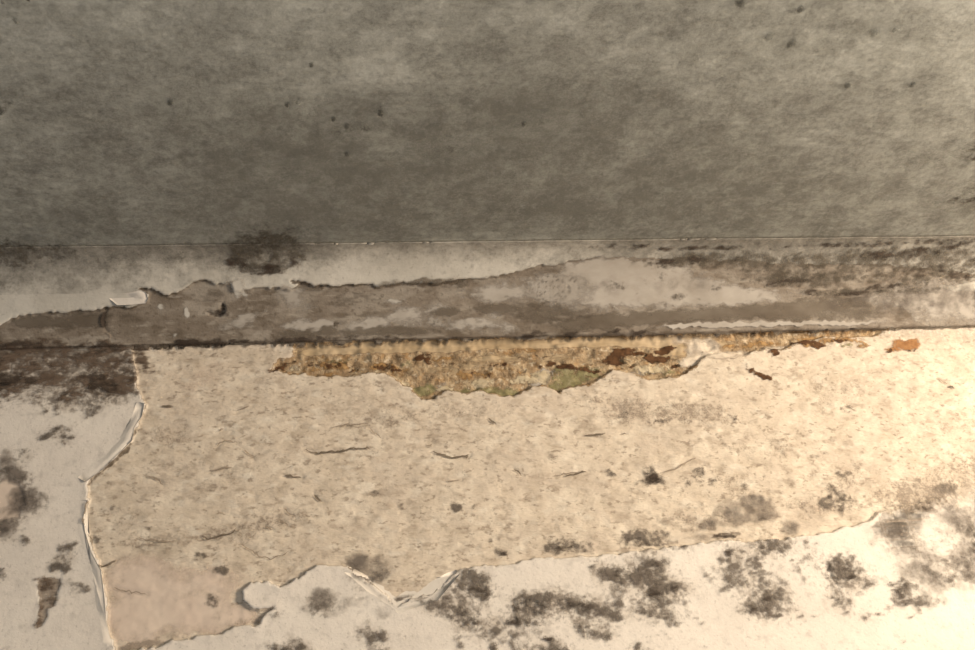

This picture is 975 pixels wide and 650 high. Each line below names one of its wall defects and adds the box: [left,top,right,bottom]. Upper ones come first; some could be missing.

water stain [79,76,975,296]
water stain [0,338,154,418]
water stain [40,425,75,444]
peeling [0,256,975,650]
water stain [0,456,36,536]
water stain [50,542,78,574]
water stain [349,555,385,581]
water stain [360,631,388,645]
water stain [421,529,686,650]
water stain [701,521,801,618]
water stain [828,553,873,588]
water stain [891,578,930,618]